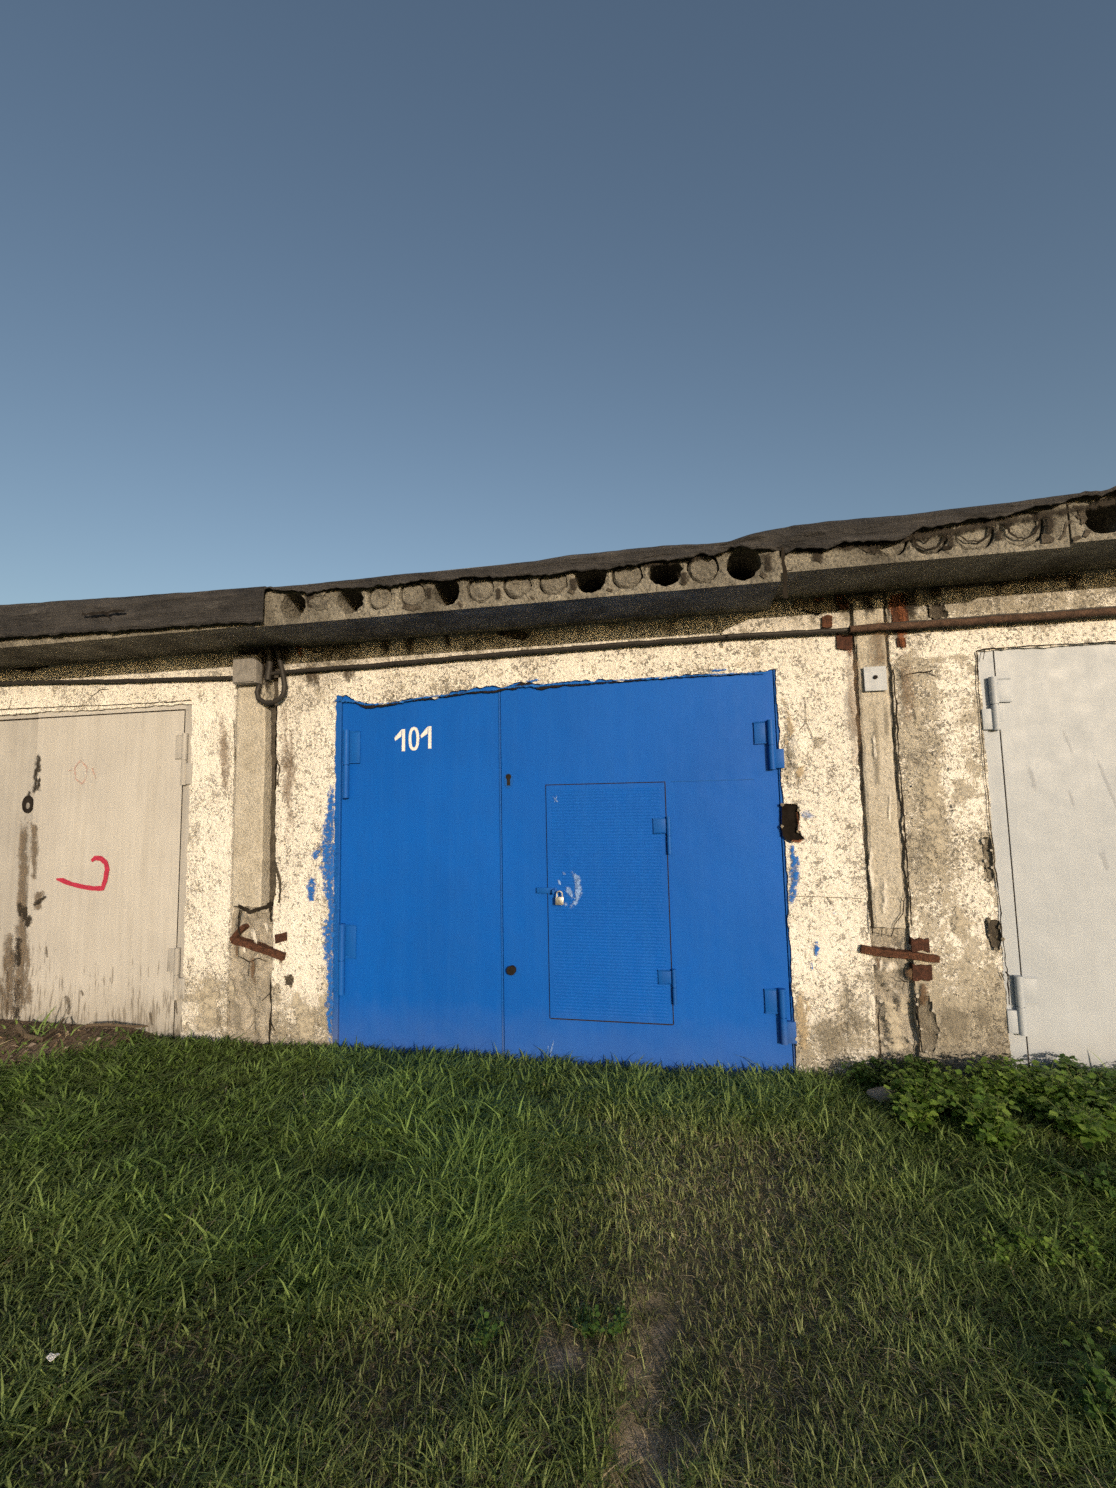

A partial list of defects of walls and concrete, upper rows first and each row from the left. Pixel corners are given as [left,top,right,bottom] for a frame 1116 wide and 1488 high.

corrosion [889,601,907,647]
spalling [781,803,805,843]
spalling [981,838,993,883]
corrosion [0,825,44,1013]
corrosion [905,969,928,1005]